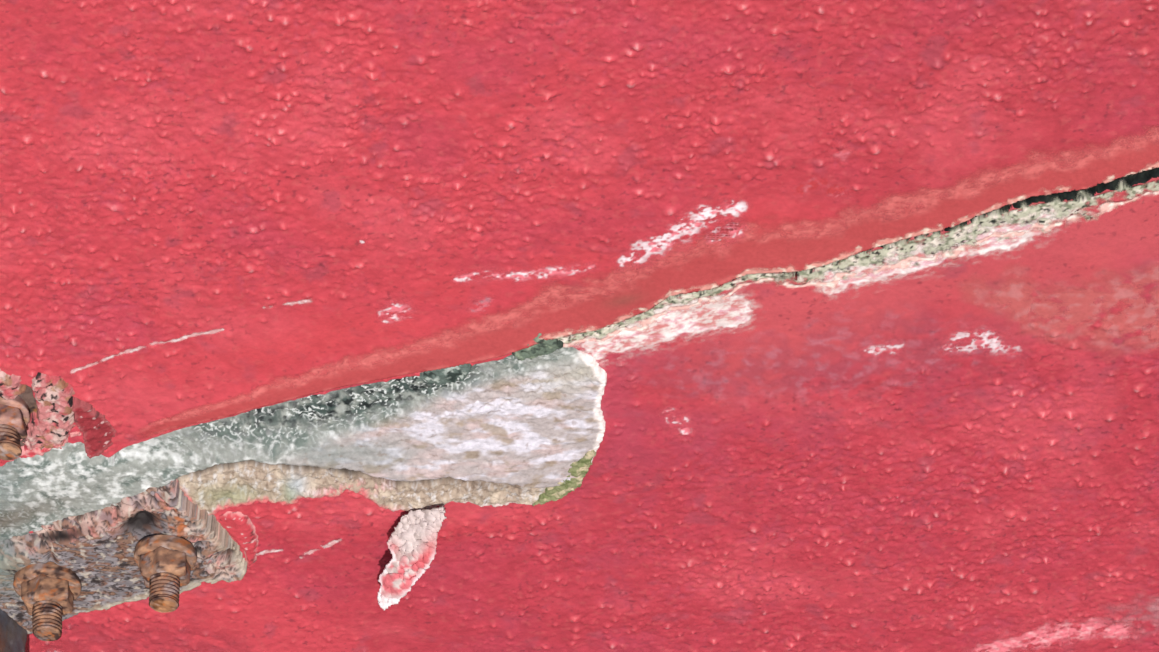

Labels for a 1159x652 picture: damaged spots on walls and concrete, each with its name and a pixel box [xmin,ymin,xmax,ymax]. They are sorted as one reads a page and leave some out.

crack [541,162,1159,348]
peeling [821,207,1071,295]
flaking render [0,295,753,610]